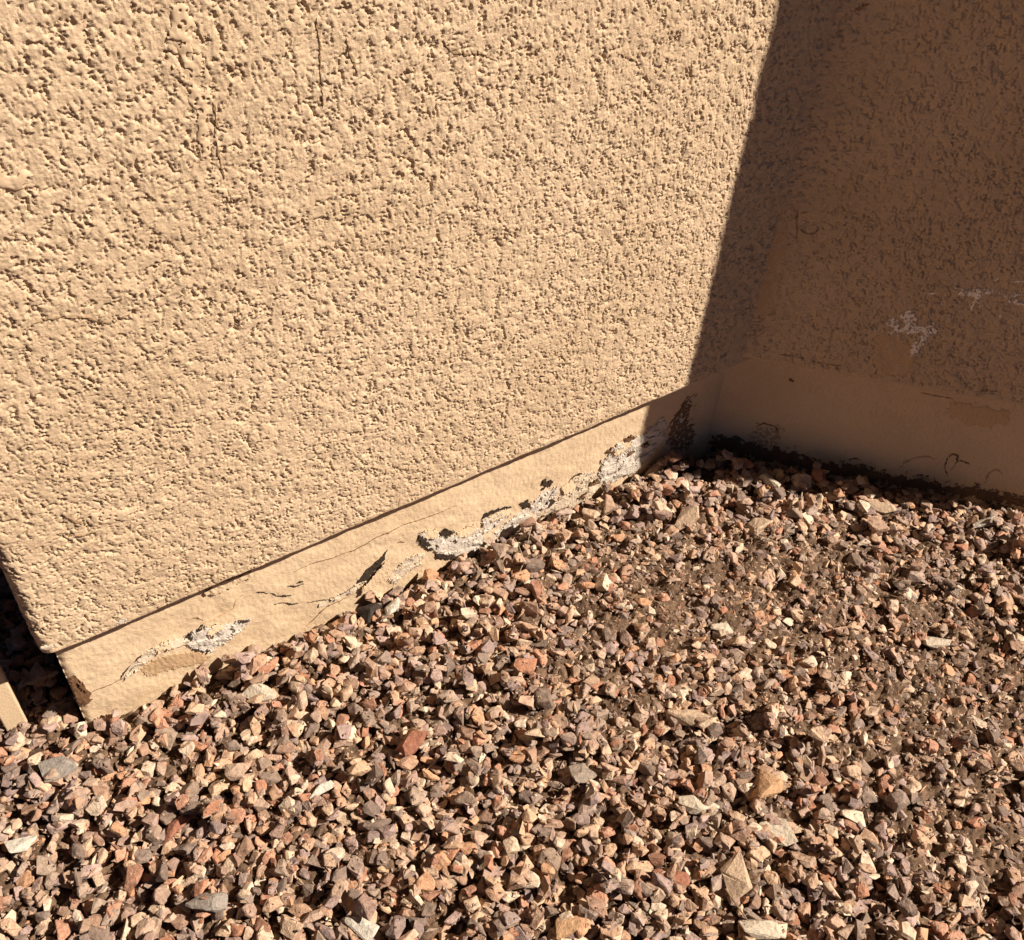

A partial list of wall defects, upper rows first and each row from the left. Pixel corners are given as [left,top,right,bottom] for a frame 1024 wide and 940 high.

peeling [606,435,649,470]
crack [191,505,457,623]
peeling [123,617,251,681]